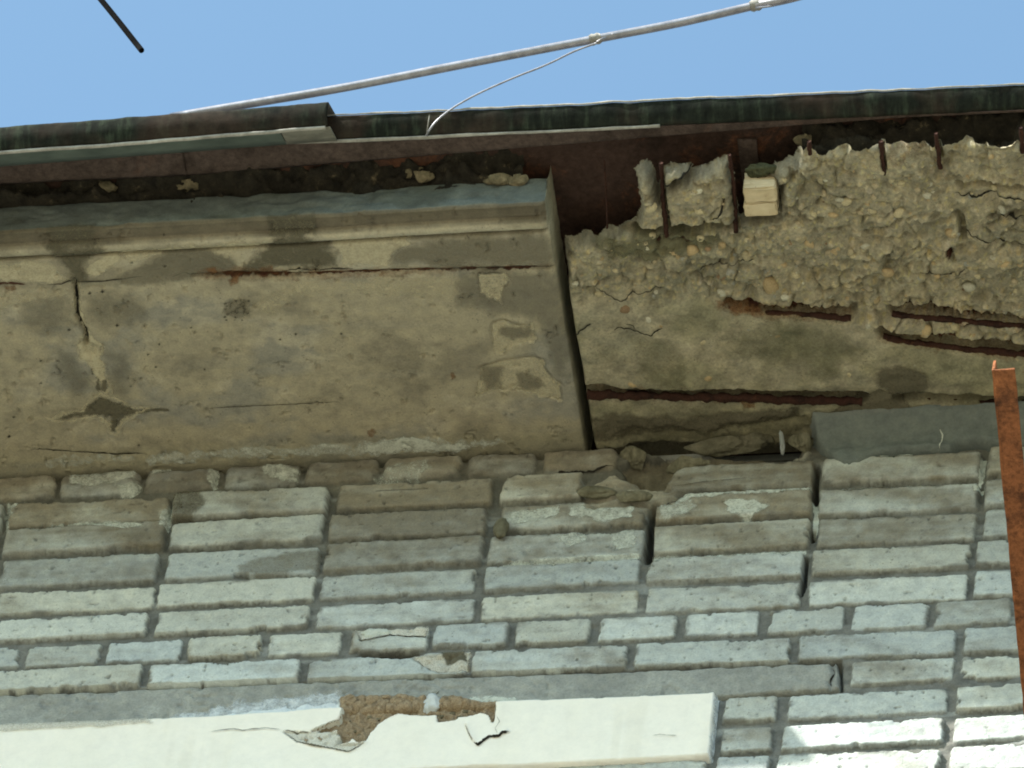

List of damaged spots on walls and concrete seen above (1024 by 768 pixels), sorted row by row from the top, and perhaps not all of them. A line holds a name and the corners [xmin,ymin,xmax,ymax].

rust [475,121,803,290]
spalling [634,132,1024,373]
crack [0,279,121,338]
water stain [0,214,552,435]
rust [723,297,776,315]
spalling [587,376,863,406]
flaking render [283,693,508,751]